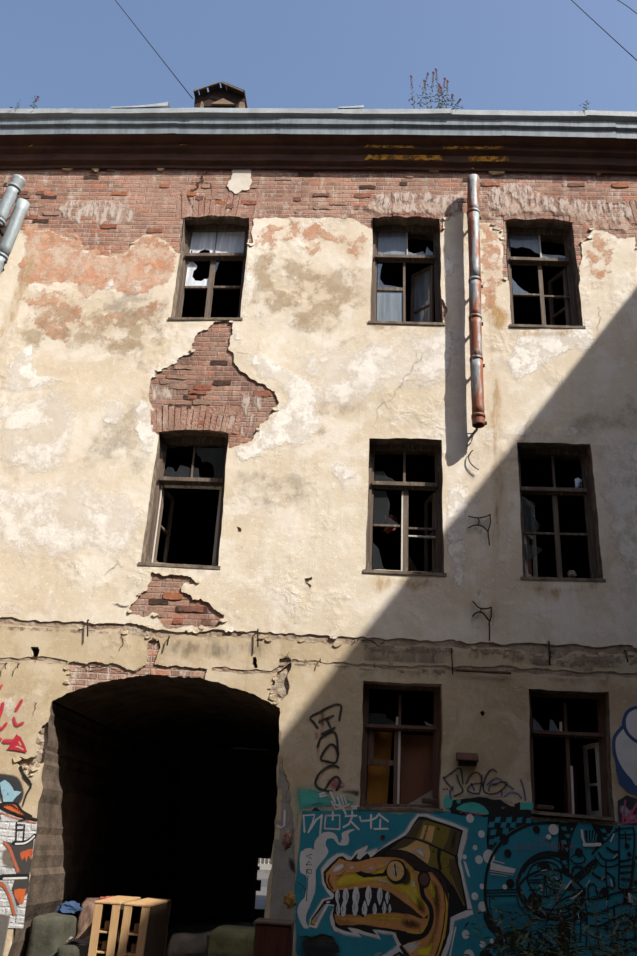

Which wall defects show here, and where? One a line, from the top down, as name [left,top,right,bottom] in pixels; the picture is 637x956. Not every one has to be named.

water stain [25,322,47,344]
water stain [58,306,162,354]
water stain [253,255,351,331]
spalling [0,169,637,343]
spalling [135,299,457,460]
crack [67,630,142,672]
spalling [0,572,637,704]
spalling [13,722,49,776]